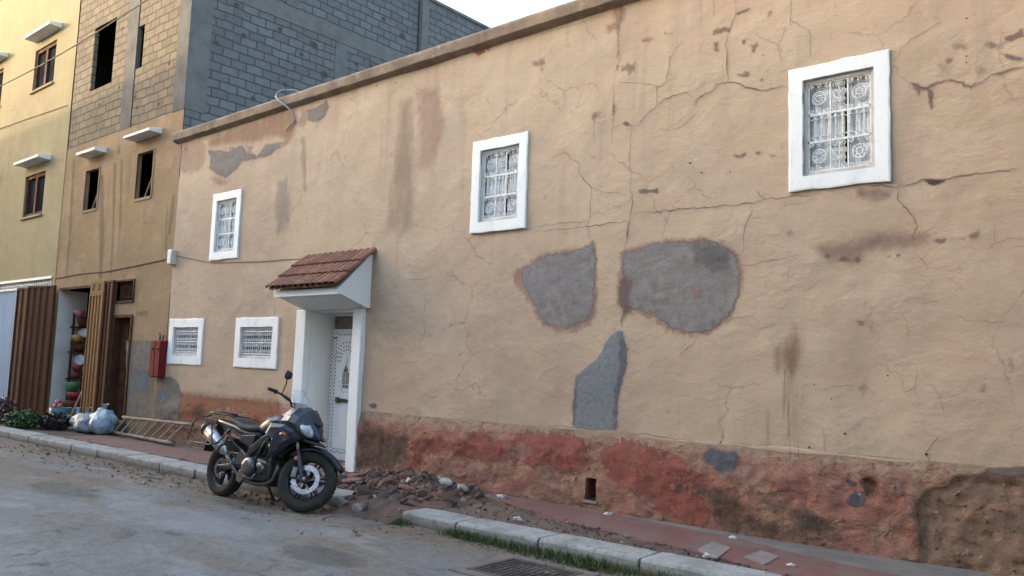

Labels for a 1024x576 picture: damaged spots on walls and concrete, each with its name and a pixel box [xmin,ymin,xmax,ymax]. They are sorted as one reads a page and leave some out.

crack [895,22,1023,109]
flaking render [209,139,288,178]
flaking render [307,101,328,121]
crack [538,2,809,277]
crack [869,169,1012,268]
damp [358,420,405,470]
spalling [898,466,1024,575]